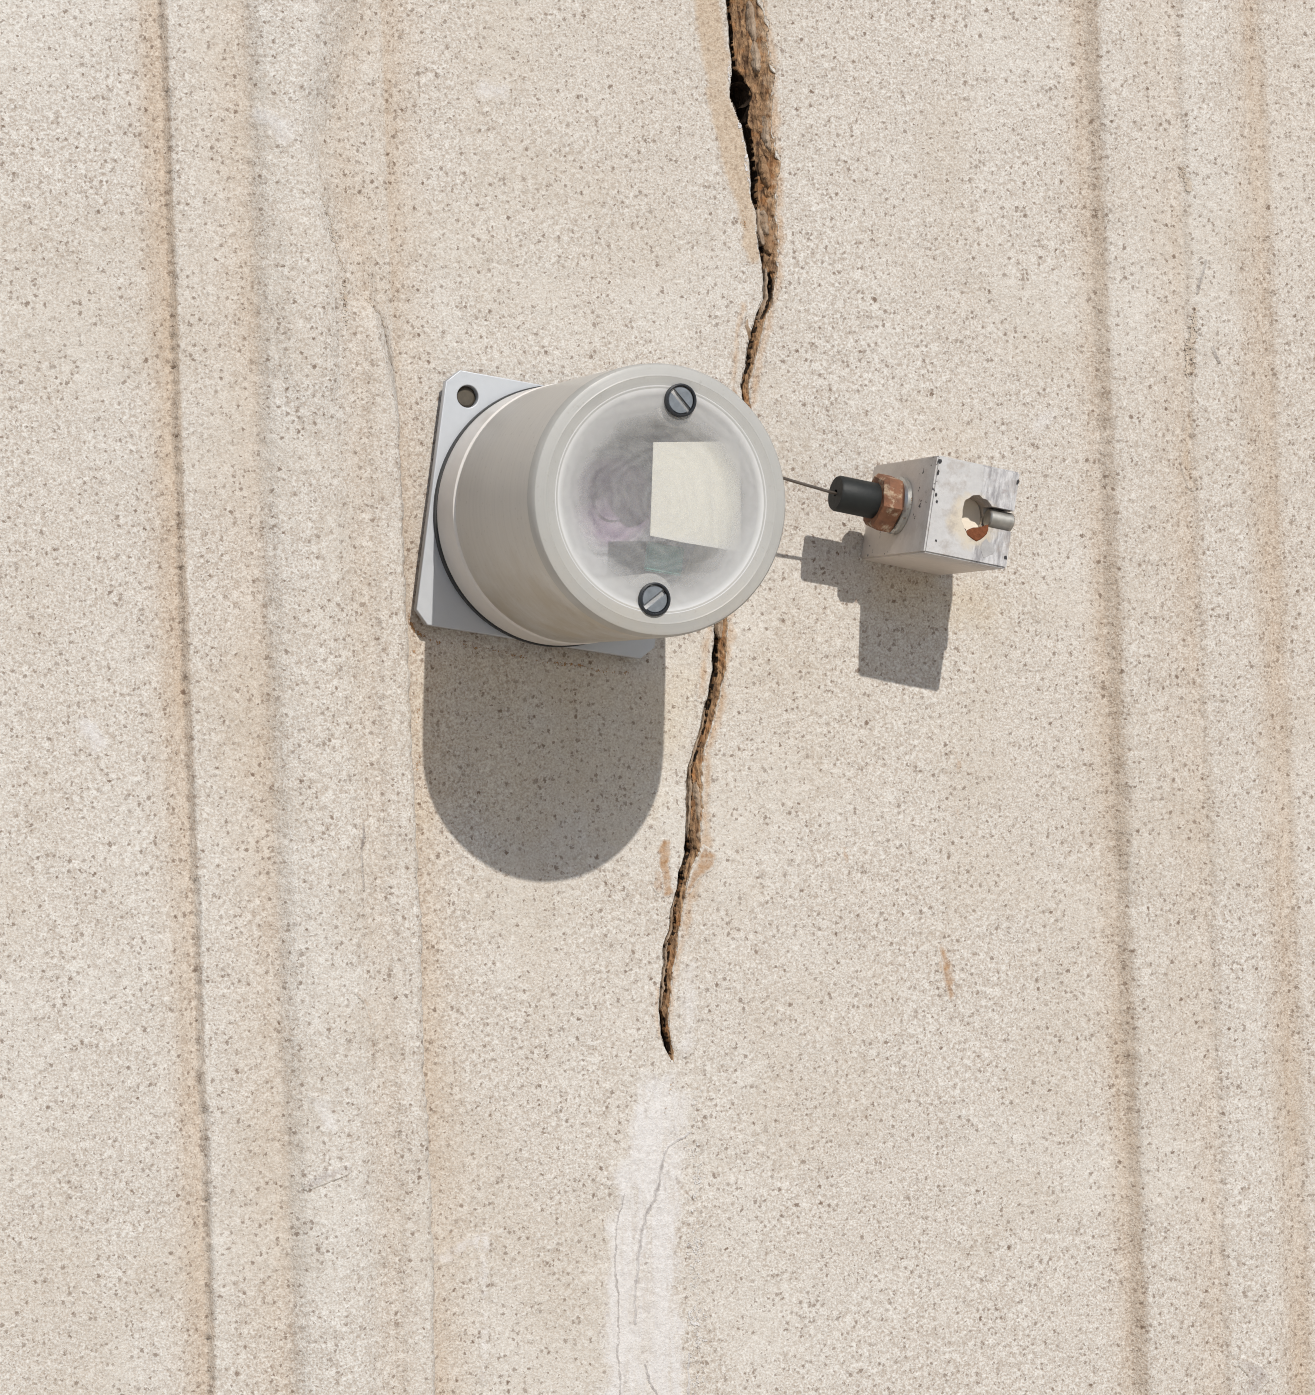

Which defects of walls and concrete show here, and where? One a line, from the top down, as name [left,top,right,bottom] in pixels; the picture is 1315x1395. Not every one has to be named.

crack [726,0,772,401]
crack [613,624,718,1395]